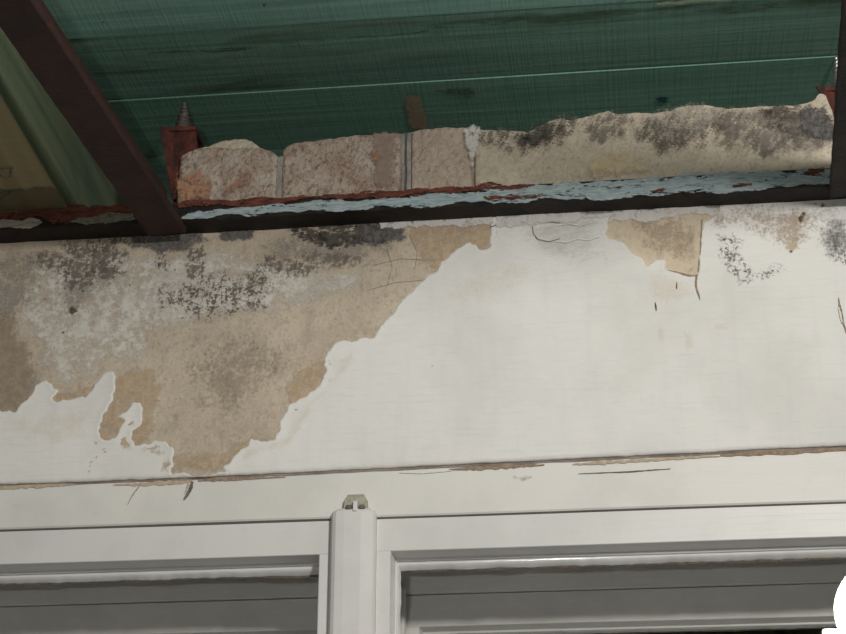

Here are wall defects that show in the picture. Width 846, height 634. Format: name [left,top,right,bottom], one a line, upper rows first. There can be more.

water stain [478,113,578,155]
water stain [586,103,834,157]
water stain [33,211,609,320]
peeling [605,205,719,277]
water stain [720,238,774,282]
water stain [746,208,846,262]
peeling [0,220,491,500]